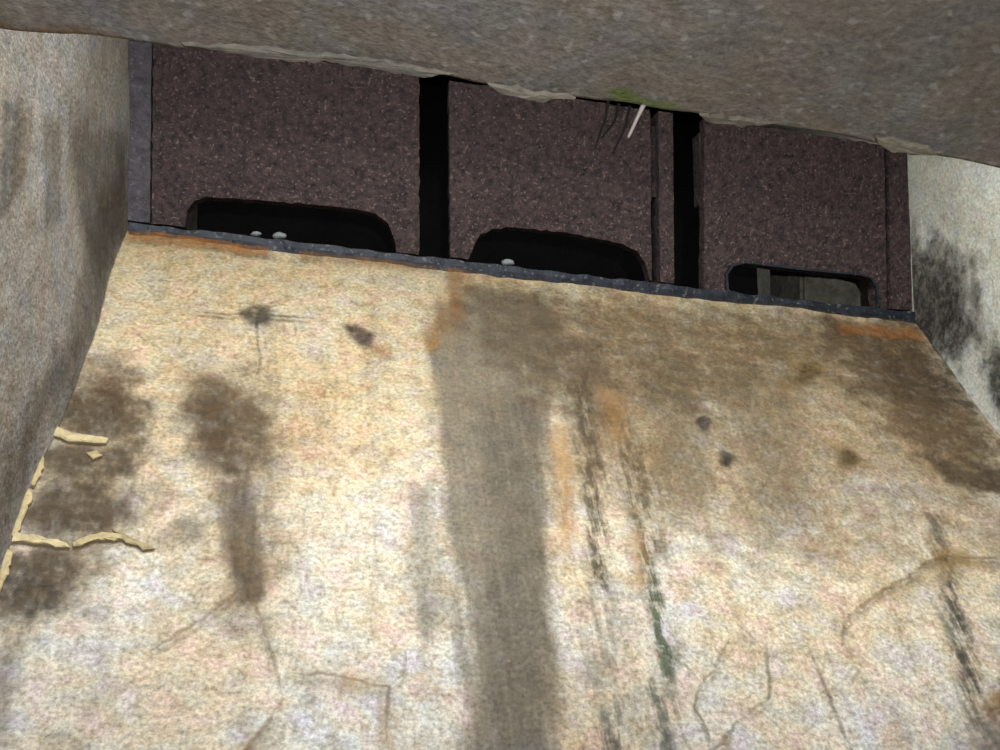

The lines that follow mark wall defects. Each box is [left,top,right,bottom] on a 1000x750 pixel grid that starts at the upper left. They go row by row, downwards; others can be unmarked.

crack [218,305,298,323]
damp [824,240,1000,492]
spalling [54,426,109,461]
damp [63,389,149,433]
spalling [0,456,155,592]
damp [26,446,132,530]
damp [185,381,267,596]
damp [430,288,558,750]
damp [0,550,76,615]
crack [856,555,993,612]